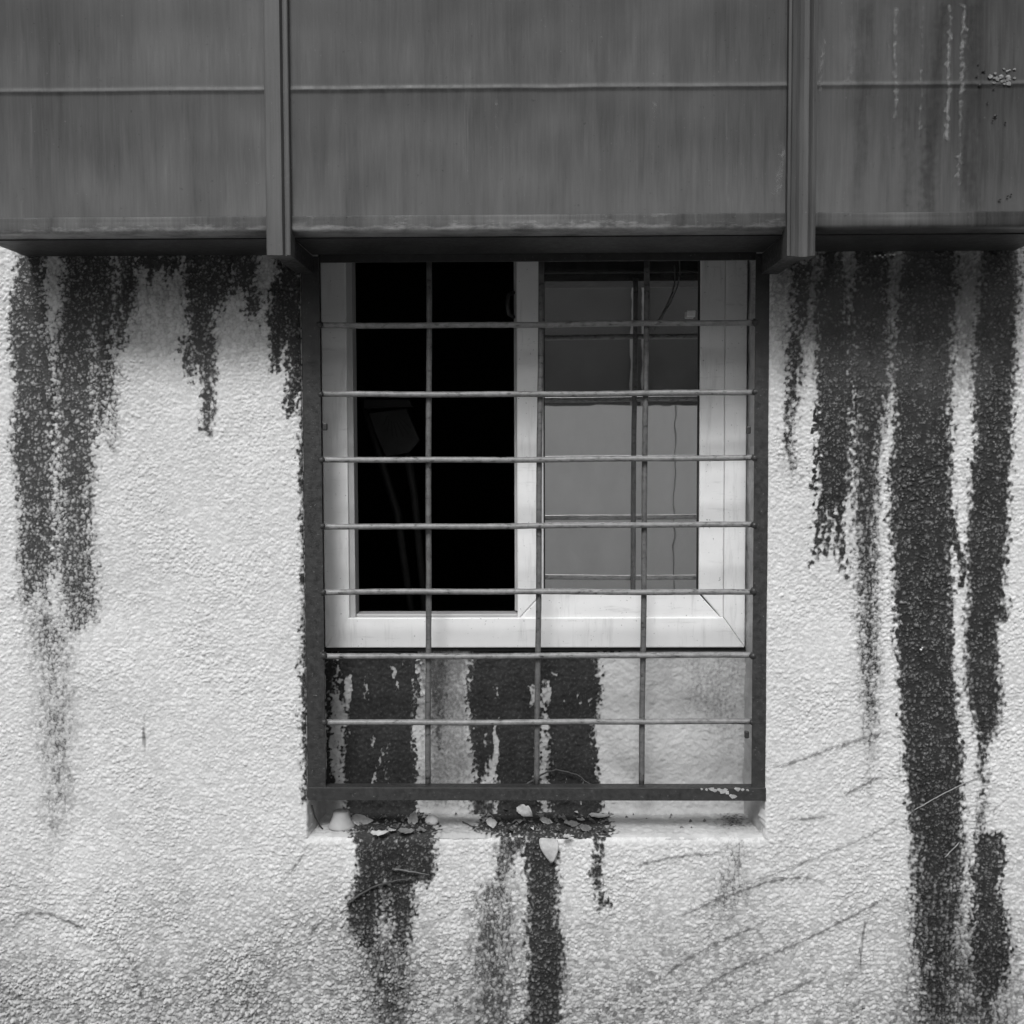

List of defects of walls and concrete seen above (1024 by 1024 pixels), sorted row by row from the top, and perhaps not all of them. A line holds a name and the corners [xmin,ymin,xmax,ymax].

leakage [944,35,964,138]
leakage [1,254,308,813]
leakage [324,650,620,784]
leakage [776,250,1024,1024]
leakage [343,800,442,1024]
leakage [469,800,616,1024]